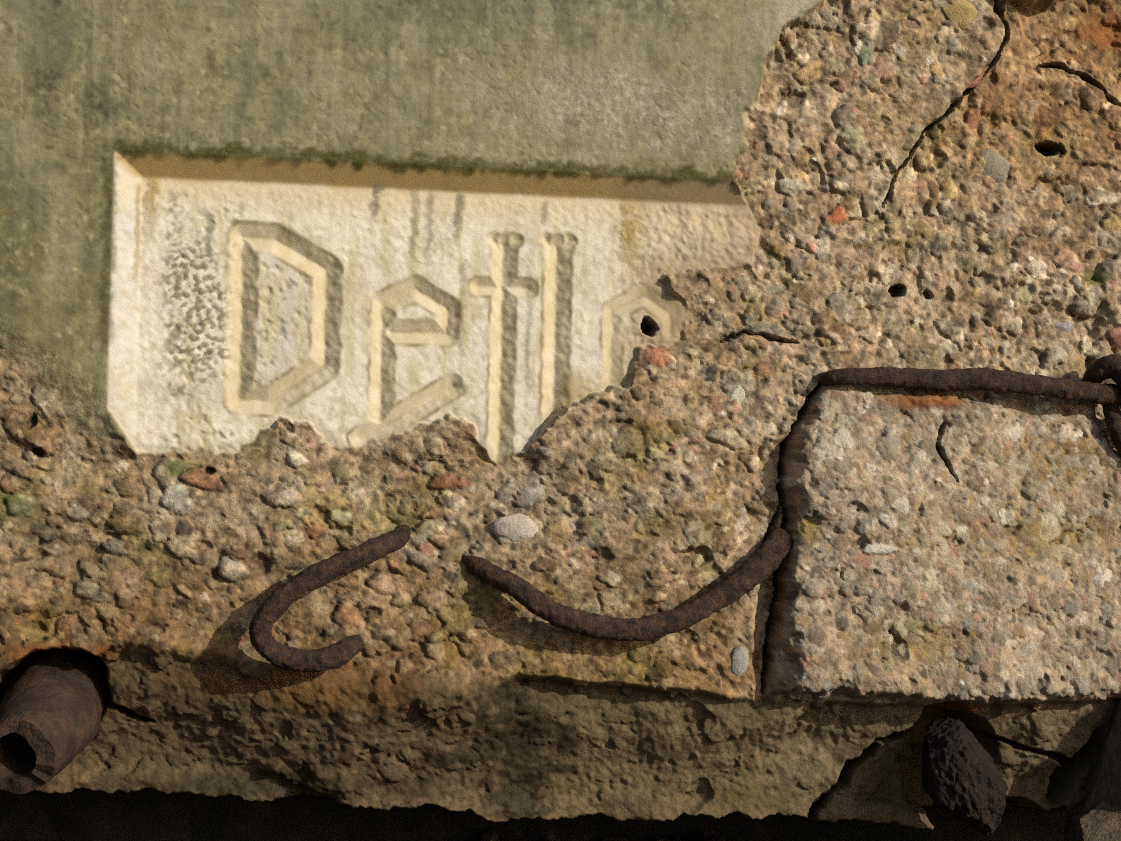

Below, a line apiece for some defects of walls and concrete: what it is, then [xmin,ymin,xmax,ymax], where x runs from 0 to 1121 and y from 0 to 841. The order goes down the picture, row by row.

crack [882,0,1010,208]
crack [1037,62,1121,107]
spalling [699,0,1121,455]
spalling [0,270,940,706]
crack [760,383,823,694]
corrosion [887,394,961,408]
crack [936,423,959,481]
spalling [35,645,952,830]
crack [807,731,908,821]
crack [941,709,1070,766]
spalling [944,696,1120,811]